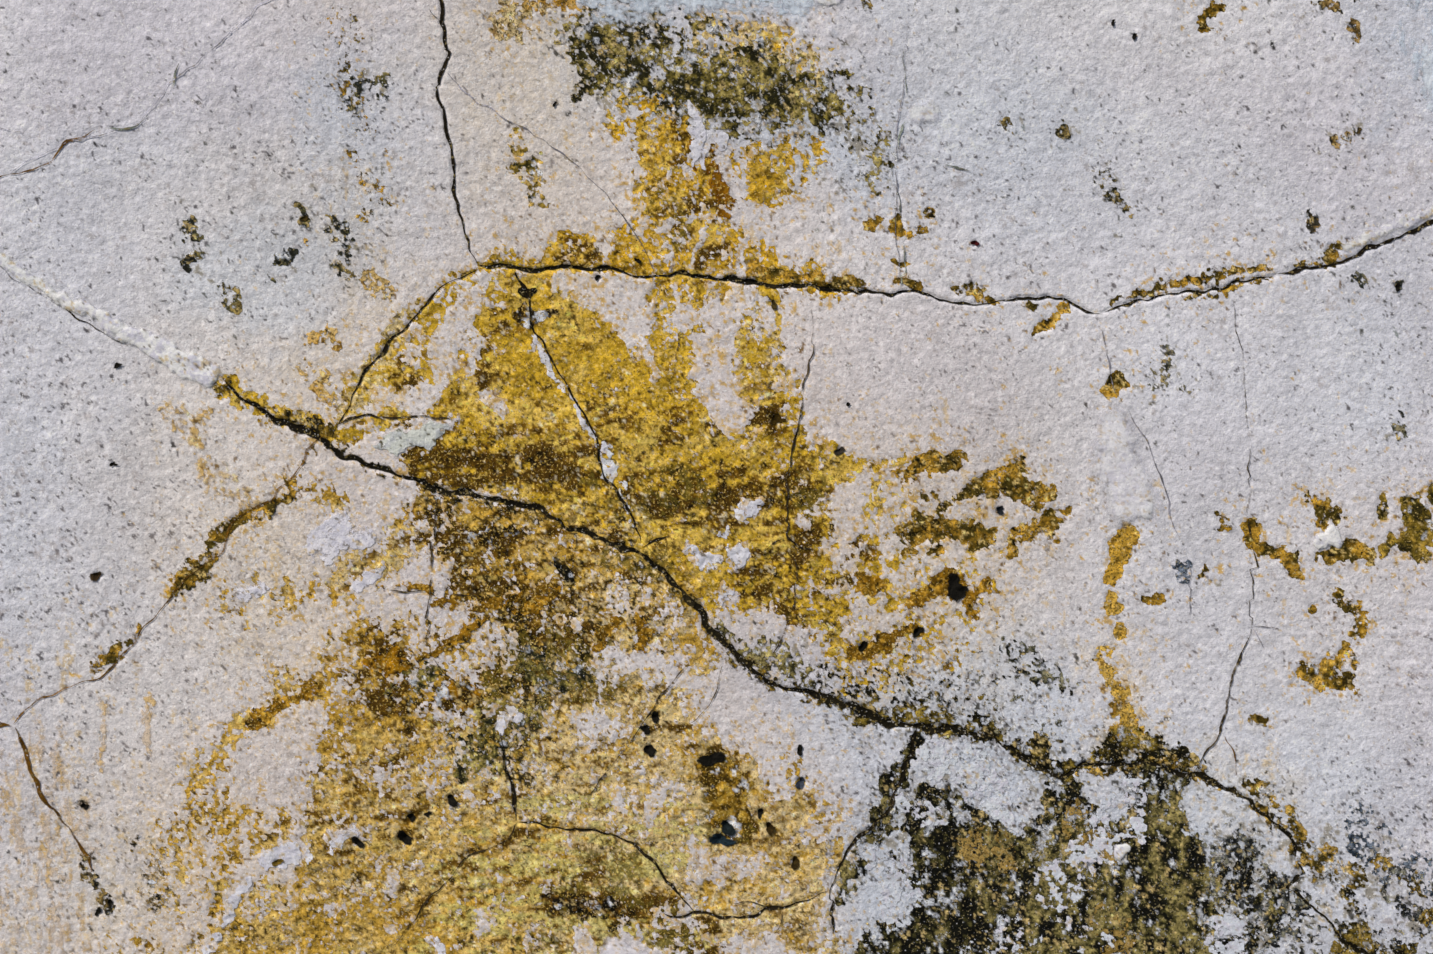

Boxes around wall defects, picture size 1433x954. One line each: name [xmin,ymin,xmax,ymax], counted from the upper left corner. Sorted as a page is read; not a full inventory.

crack [1,267,123,344]
crack [0,0,270,177]
crack [429,0,477,263]
crack [449,75,646,253]
leakage [549,0,906,219]
crack [892,172,906,285]
crack [896,44,908,159]
crack [1278,219,1433,275]
crack [209,263,1369,954]
crack [0,564,205,872]
leakage [714,565,1433,954]